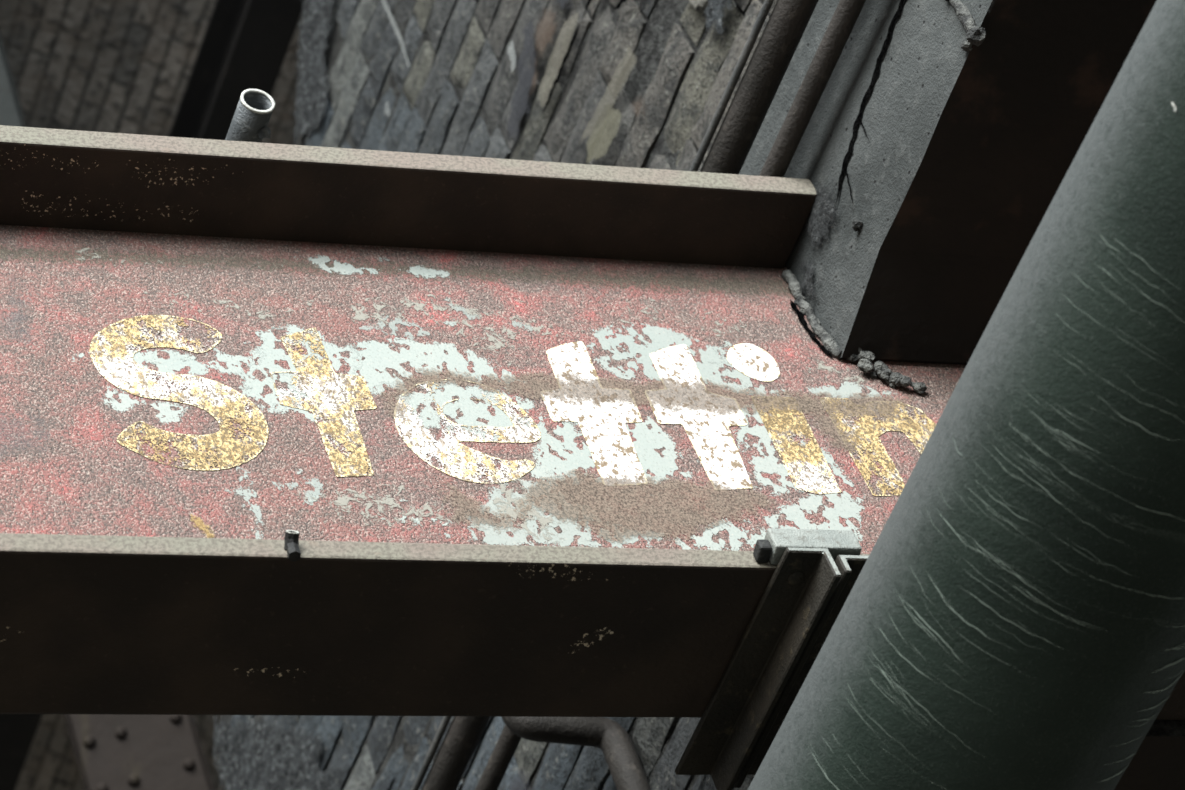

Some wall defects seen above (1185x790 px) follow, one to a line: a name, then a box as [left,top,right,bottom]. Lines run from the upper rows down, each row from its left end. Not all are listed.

crack [835,0,904,215]
spalling [781,270,927,402]
peeling [104,386,188,425]
peeling [130,254,865,551]
rust [378,368,915,452]
rust [437,469,775,543]